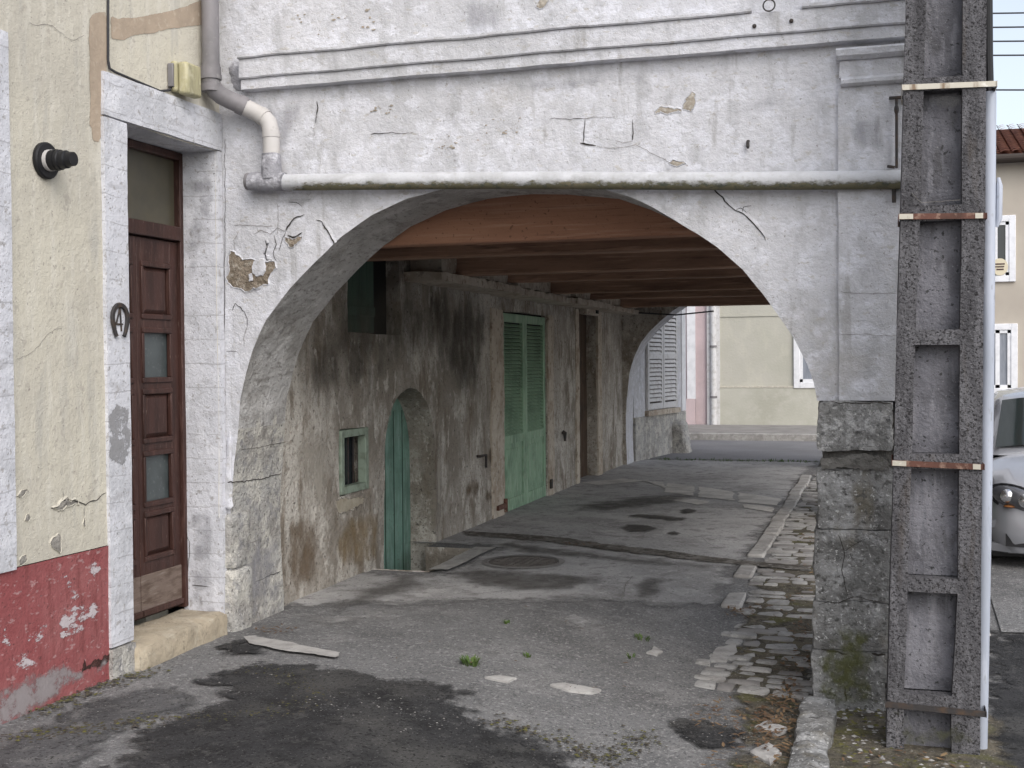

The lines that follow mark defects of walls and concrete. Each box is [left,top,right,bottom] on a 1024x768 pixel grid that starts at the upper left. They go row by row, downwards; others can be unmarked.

peeling [654,91,696,116]
crack [551,116,670,163]
crack [714,190,767,240]
spalling [225,250,278,294]
crack [224,155,337,352]
spalling [51,496,86,529]
water stain [462,570,586,589]
water stain [503,544,668,564]
crack [819,535,880,605]
peeling [59,576,98,638]
peeling [0,654,109,725]